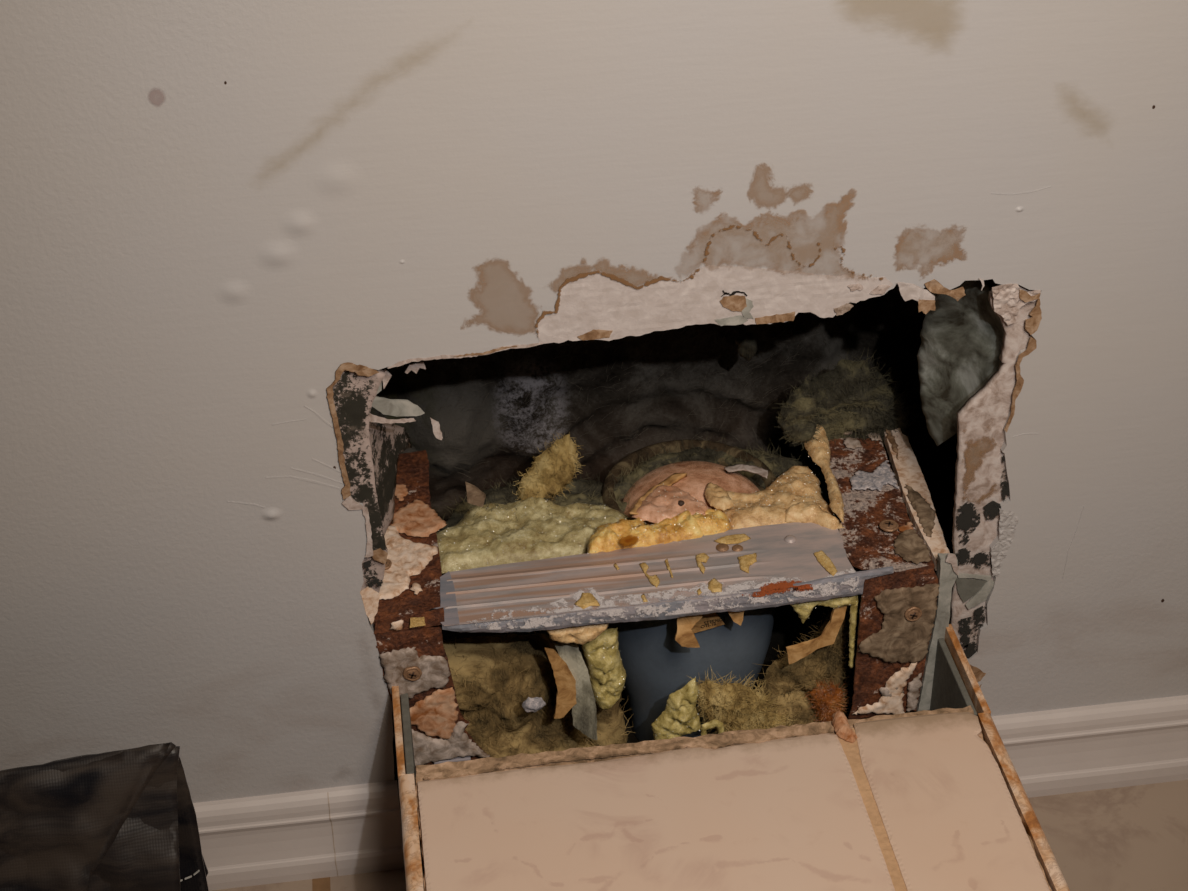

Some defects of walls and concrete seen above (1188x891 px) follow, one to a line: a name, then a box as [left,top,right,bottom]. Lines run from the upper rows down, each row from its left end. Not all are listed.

peeling [537,265,966,344]
peeling [992,283,1041,325]
peeling [355,362,443,440]
corrosion [850,460,899,491]
damp [955,456,1009,569]
spalling [956,578,987,603]
spalling [431,625,548,640]
spalling [753,604,833,692]
spalling [843,594,871,719]
damp [958,606,987,659]
spalling [618,688,640,743]
spalling [392,703,402,824]